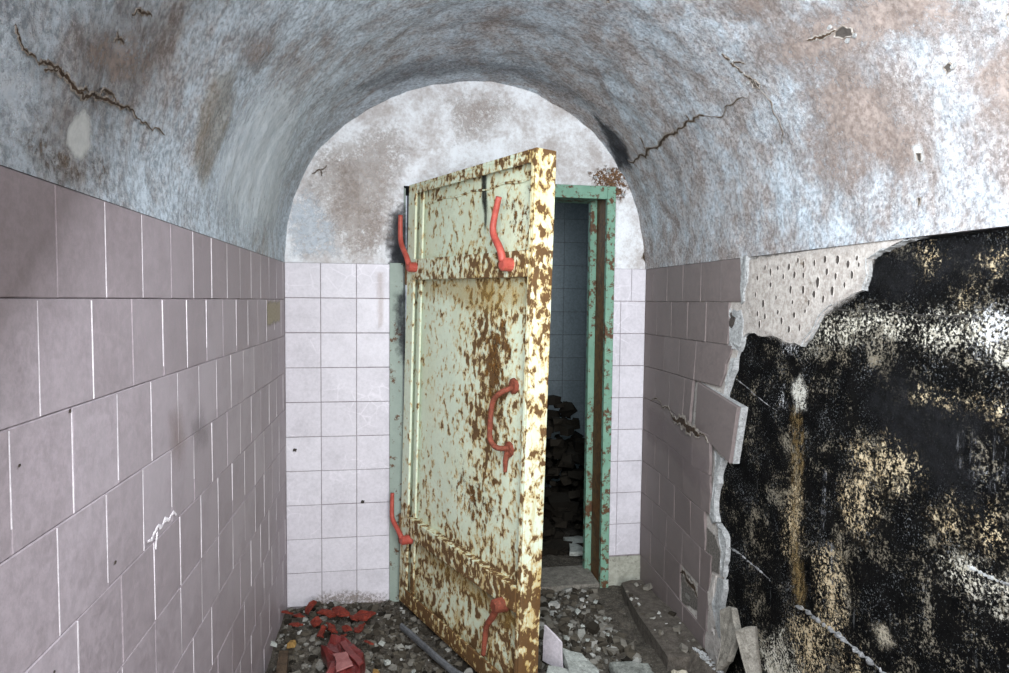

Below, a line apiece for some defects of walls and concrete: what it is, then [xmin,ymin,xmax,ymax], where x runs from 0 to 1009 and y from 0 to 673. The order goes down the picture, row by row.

crack [113,7,152,45]
crack [14,24,165,135]
crack [627,53,784,164]
water stain [594,116,631,168]
water stain [387,208,408,266]
water stain [780,377,807,411]
spalling [681,230,1009,673]